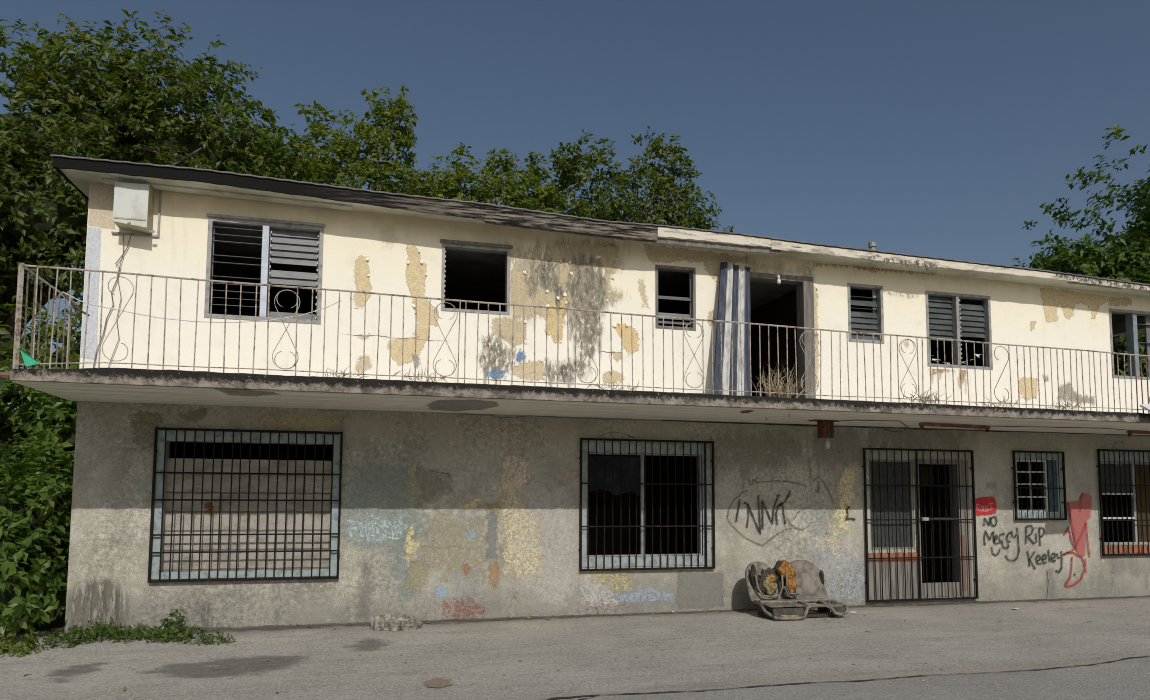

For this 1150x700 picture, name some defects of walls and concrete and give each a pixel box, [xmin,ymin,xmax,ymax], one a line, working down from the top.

peeling [353,255,372,309]
peeling [387,244,439,366]
water stain [510,241,620,386]
peeling [1030,288,1132,331]
peeling [603,321,640,384]
peeling [1019,377,1038,400]
crack [546,656,1147,700]